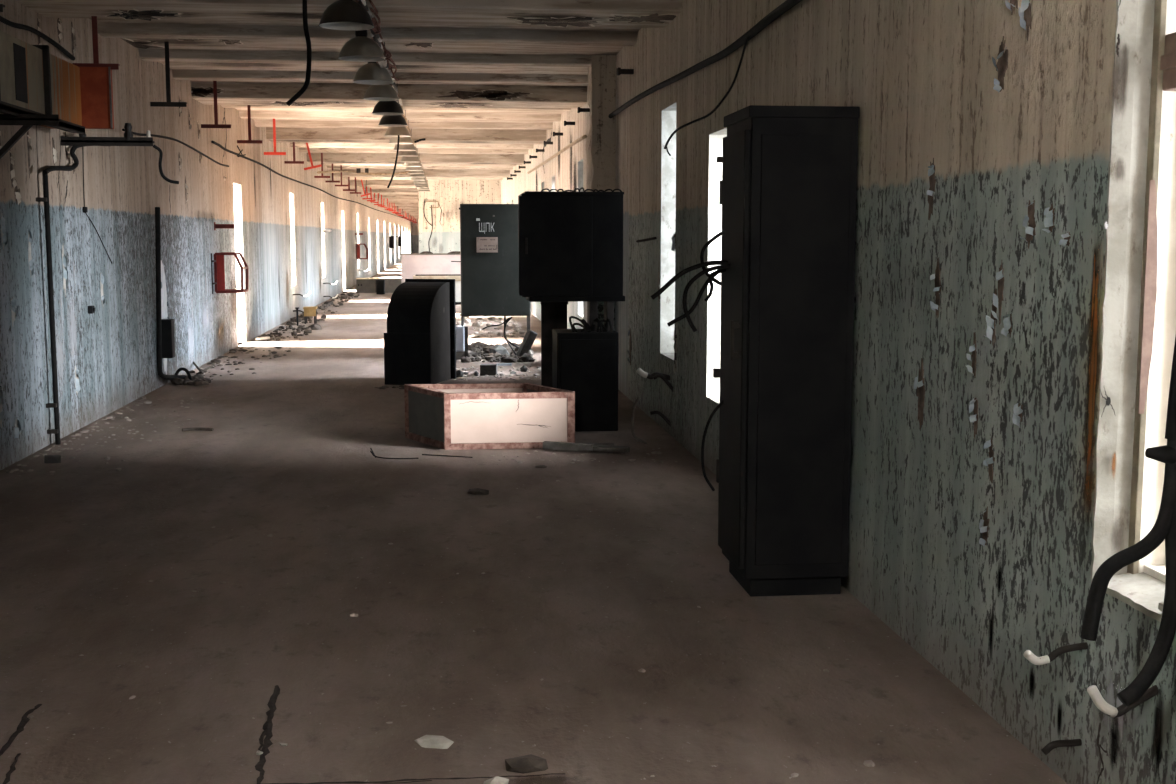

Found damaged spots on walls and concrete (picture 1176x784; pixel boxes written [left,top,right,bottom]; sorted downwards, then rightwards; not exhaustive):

crack [0,704,42,784]
crack [255,685,565,784]